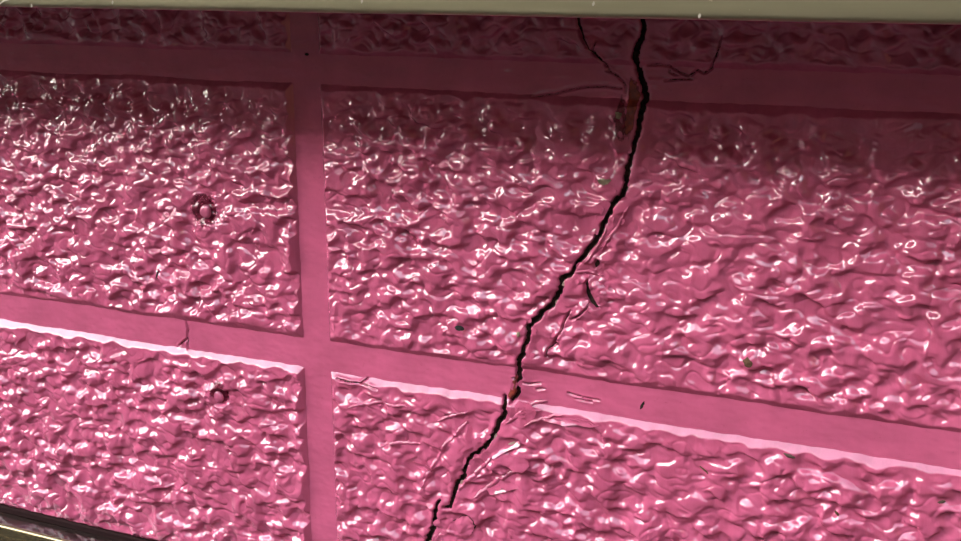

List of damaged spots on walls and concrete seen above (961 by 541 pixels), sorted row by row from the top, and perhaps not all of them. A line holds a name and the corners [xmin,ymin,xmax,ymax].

crack [426,18,721,541]